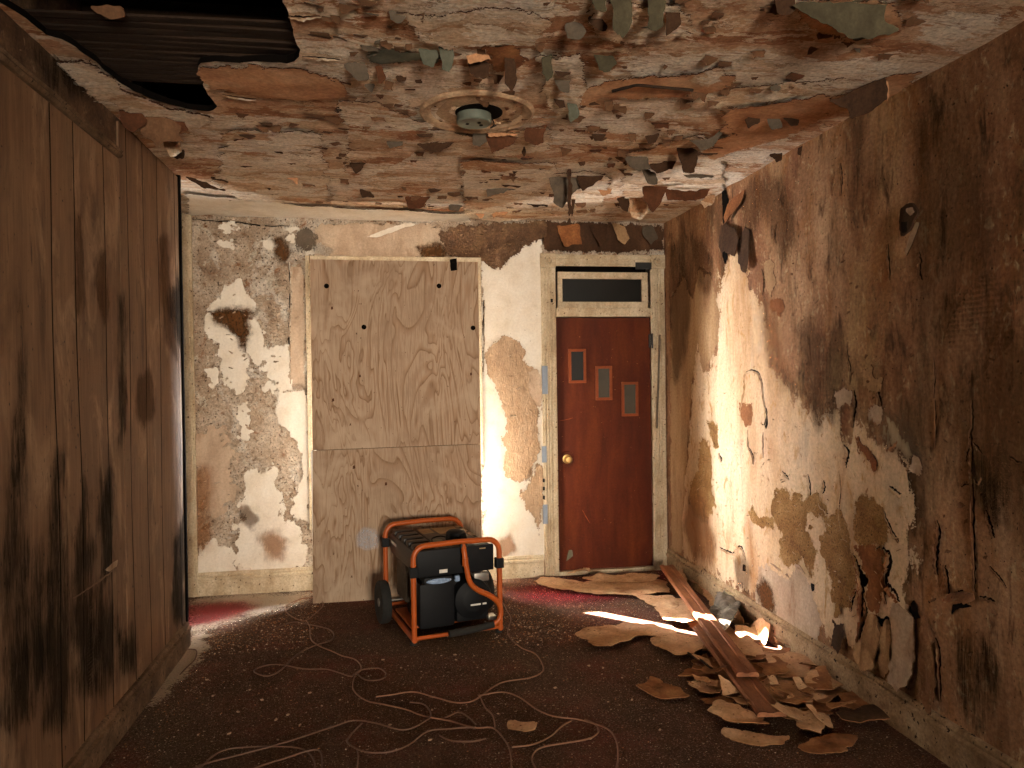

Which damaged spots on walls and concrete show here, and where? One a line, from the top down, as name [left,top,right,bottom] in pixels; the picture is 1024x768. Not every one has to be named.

peeling [760,0,929,55]
peeling [56,59,215,159]
peeling [184,0,737,256]
peeling [680,55,923,163]
water stain [764,302,843,422]
flaking render [198,273,309,573]
flaking render [682,253,925,659]
water stain [883,416,912,458]
crack [932,400,1007,594]
water stain [0,445,136,734]
water stain [735,558,749,590]
water stain [957,630,998,727]